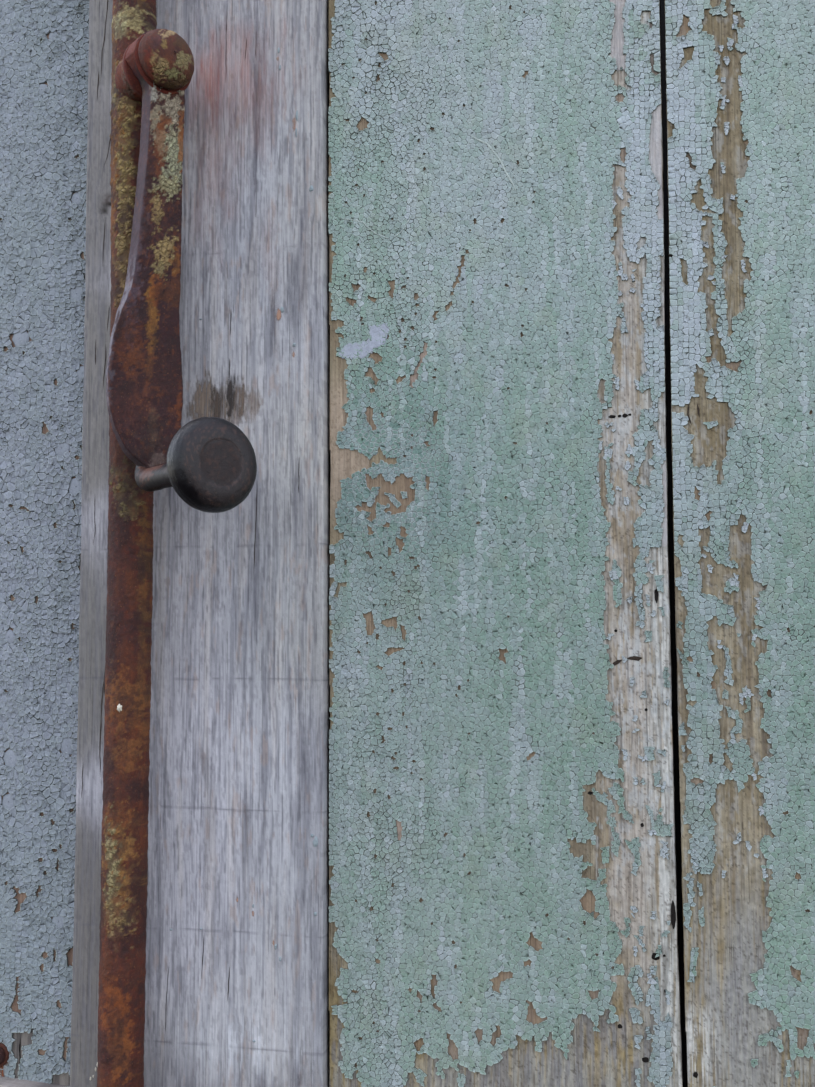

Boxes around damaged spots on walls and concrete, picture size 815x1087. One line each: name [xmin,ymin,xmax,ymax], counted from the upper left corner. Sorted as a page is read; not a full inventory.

water stain [187,371,258,421]
peeling [329,234,430,569]
peeling [396,341,438,388]
peeling [404,0,815,1087]
peeling [329,578,347,729]
peeling [358,604,421,670]
crack [613,656,642,666]
peeling [5,844,62,917]
peeling [40,943,73,972]
peeling [11,977,24,1014]
peeling [329,922,361,1087]
peeling [7,1028,46,1078]